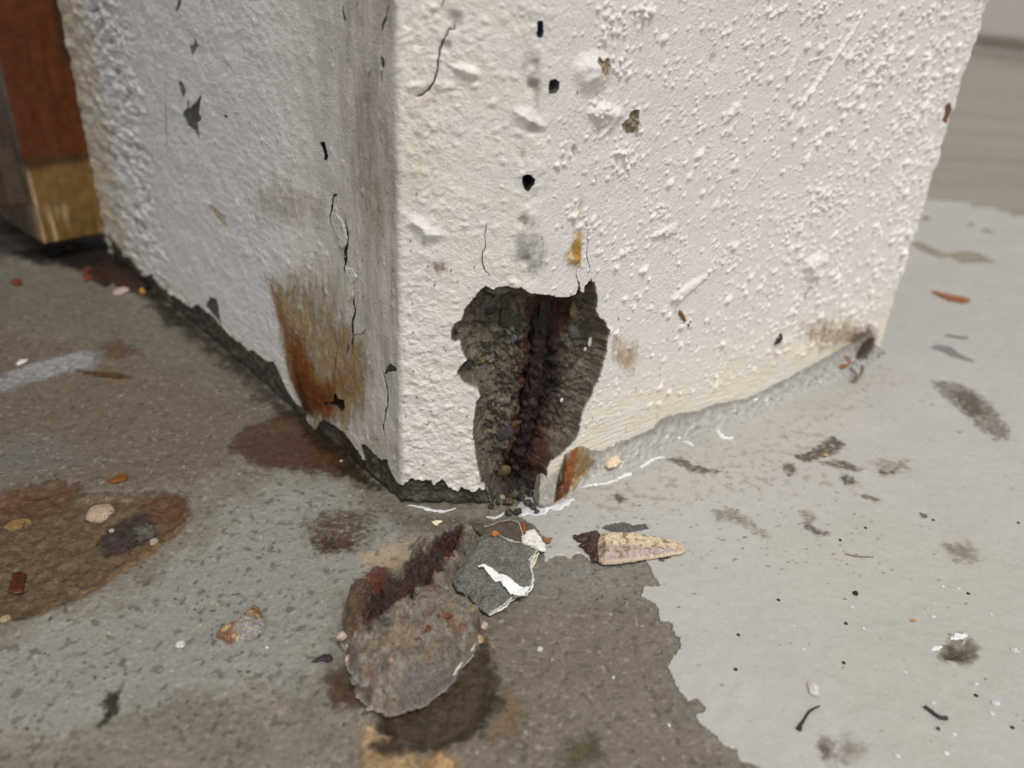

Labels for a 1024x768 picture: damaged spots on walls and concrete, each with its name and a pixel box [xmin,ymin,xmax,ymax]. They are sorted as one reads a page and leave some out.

crack [418,0,455,97]
peeling [178,80,201,139]
peeling [622,109,640,135]
peeling [109,233,306,418]
crack [329,194,365,374]
rust [567,232,582,265]
rust [229,283,381,490]
spalling [315,278,611,508]
rust [554,446,594,502]